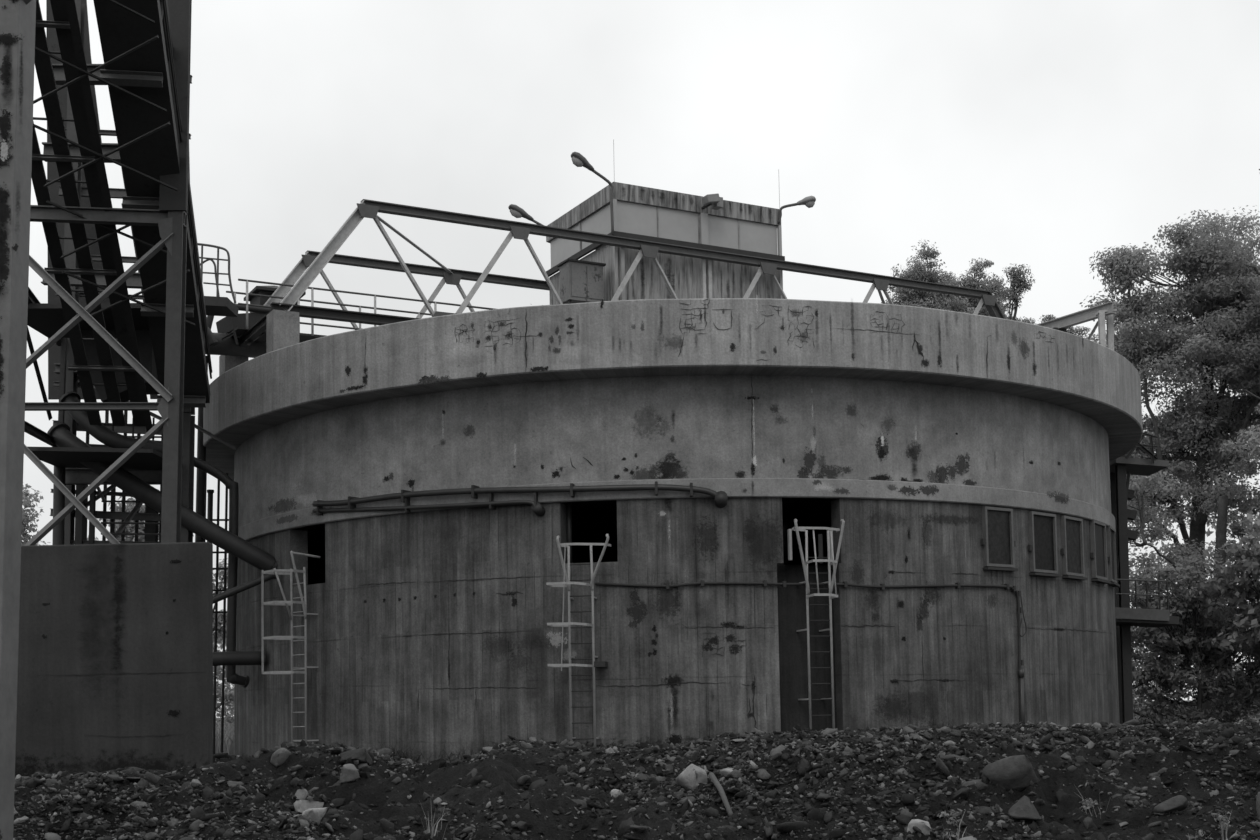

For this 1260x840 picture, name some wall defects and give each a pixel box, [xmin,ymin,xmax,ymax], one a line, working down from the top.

corrosion [0,33,23,115]
corrosion [0,182,20,294]
water stain [819,465,851,479]
water stain [871,427,923,482]